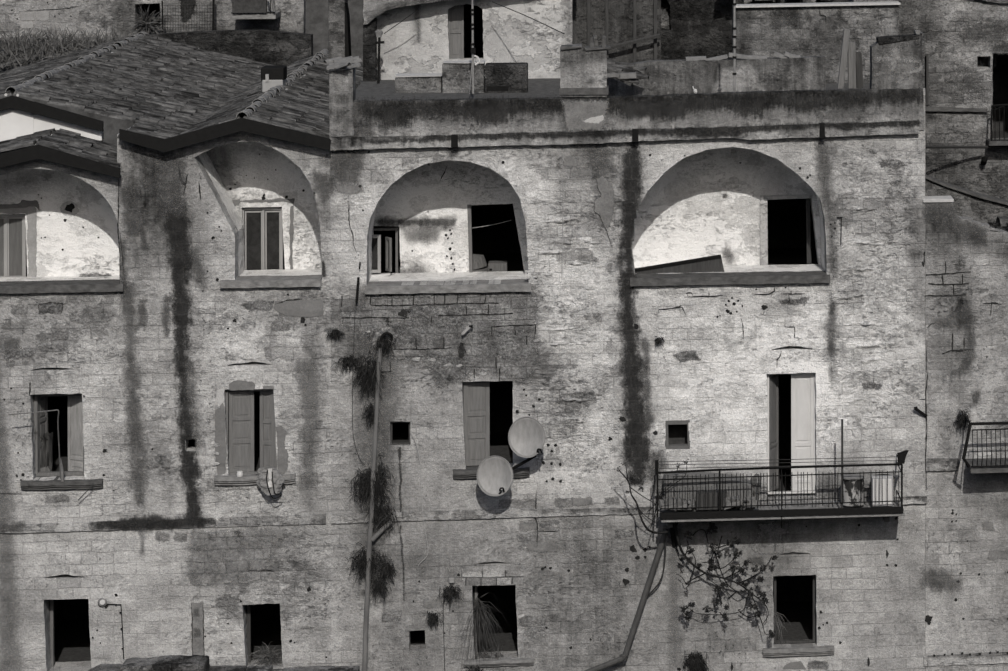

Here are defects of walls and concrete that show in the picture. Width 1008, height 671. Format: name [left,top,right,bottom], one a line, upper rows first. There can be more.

leakage [90,157,216,551]
leakage [314,85,924,511]
leakage [0,434,25,671]